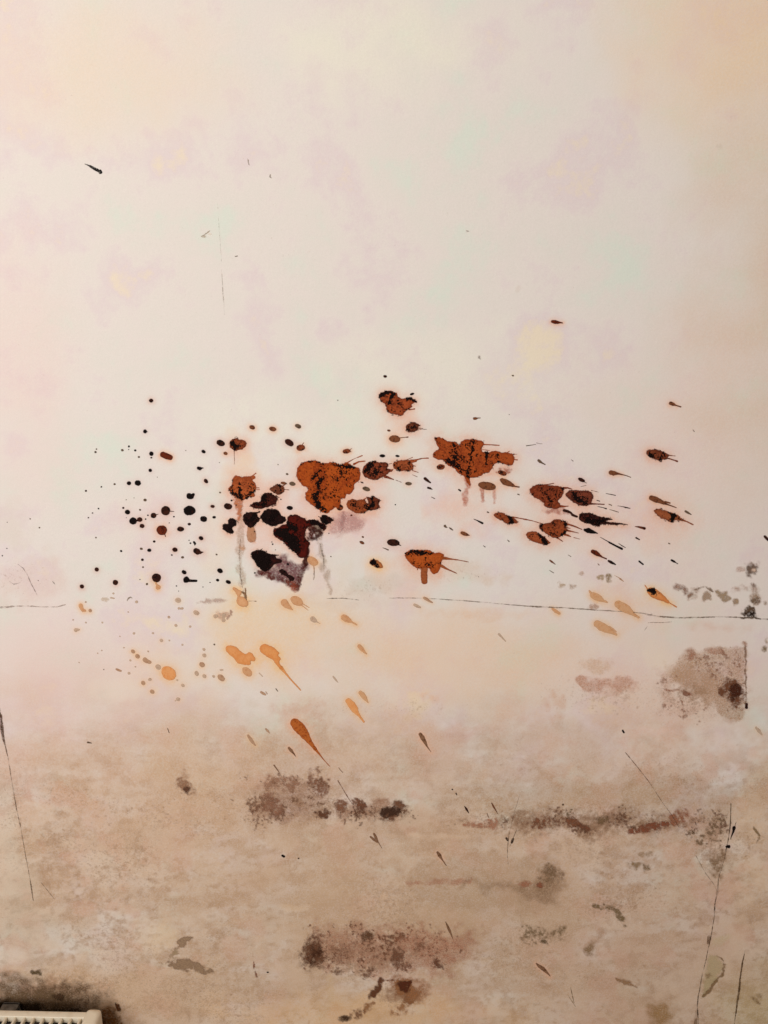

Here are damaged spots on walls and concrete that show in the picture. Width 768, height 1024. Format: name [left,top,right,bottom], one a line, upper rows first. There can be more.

leakage [666,642,747,719]
crack [0,712,11,774]
leakage [247,769,414,826]
leakage [531,805,727,845]
leakage [301,924,443,977]